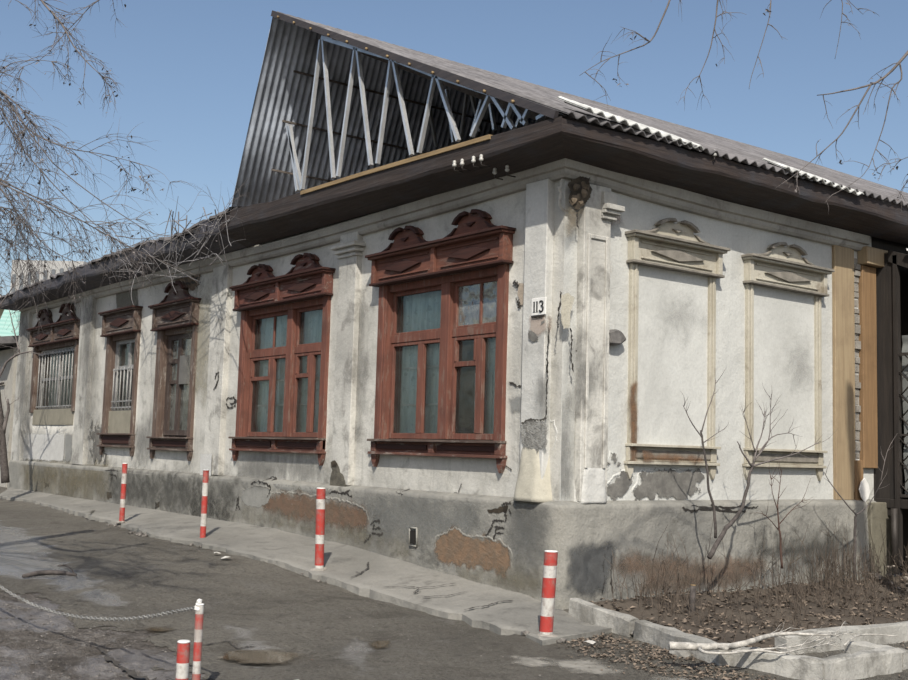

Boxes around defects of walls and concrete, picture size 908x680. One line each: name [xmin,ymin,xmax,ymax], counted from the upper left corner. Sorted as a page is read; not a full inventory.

peeling [528,317,547,342]
crack [521,291,574,424]
flaking render [520,420,558,453]
rust [630,383,702,463]
spalling [330,460,354,487]
flaking render [607,450,705,501]
spalling [241,484,369,533]
crack [485,501,511,539]
spalling [434,526,513,577]
water stain [567,543,614,595]